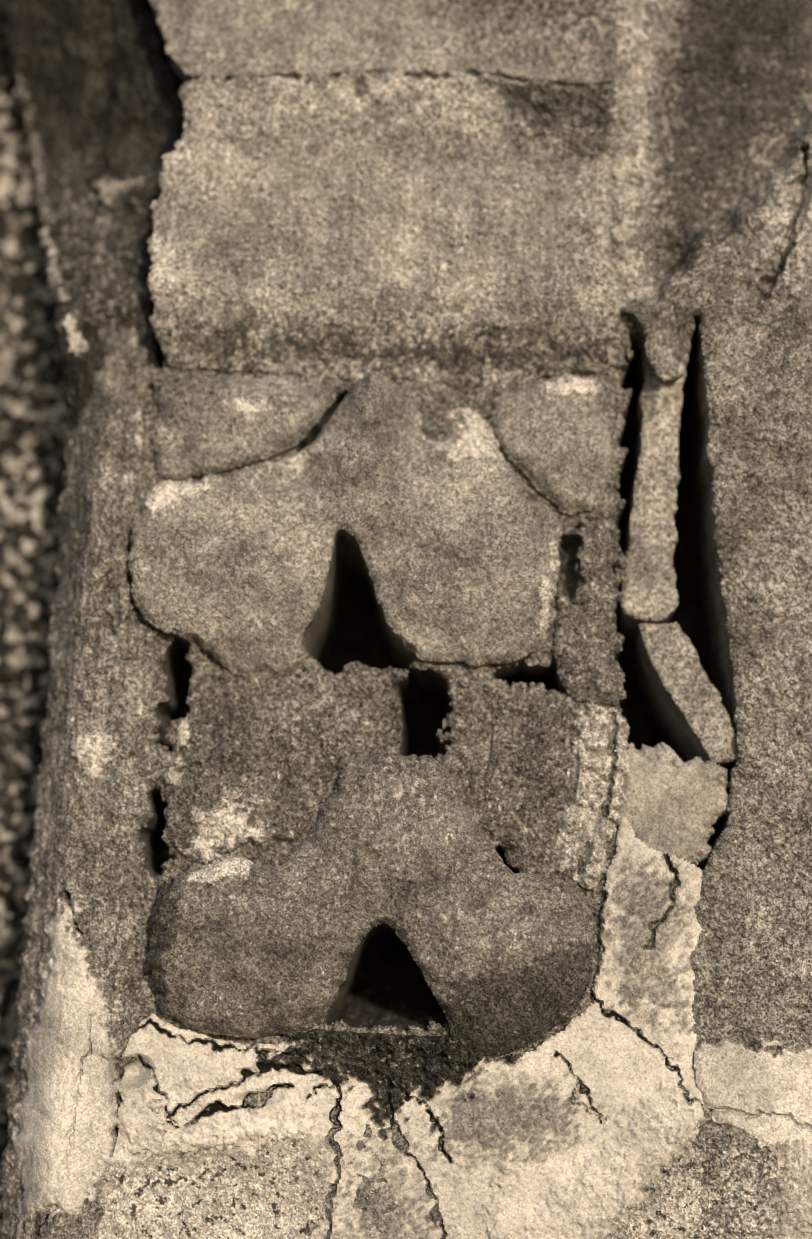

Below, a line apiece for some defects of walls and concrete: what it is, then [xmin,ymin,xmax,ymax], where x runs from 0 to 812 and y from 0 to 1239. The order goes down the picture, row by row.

leakage [444,852,702,1056]
crack [590,892,712,1111]
crack [645,853,680,949]
leakage [116,1103,319,1160]
crack [132,1019,342,1193]
crack [388,1094,451,1206]
leakage [320,1066,699,1239]
crack [554,1052,606,1123]
leakage [766,1139,812,1239]